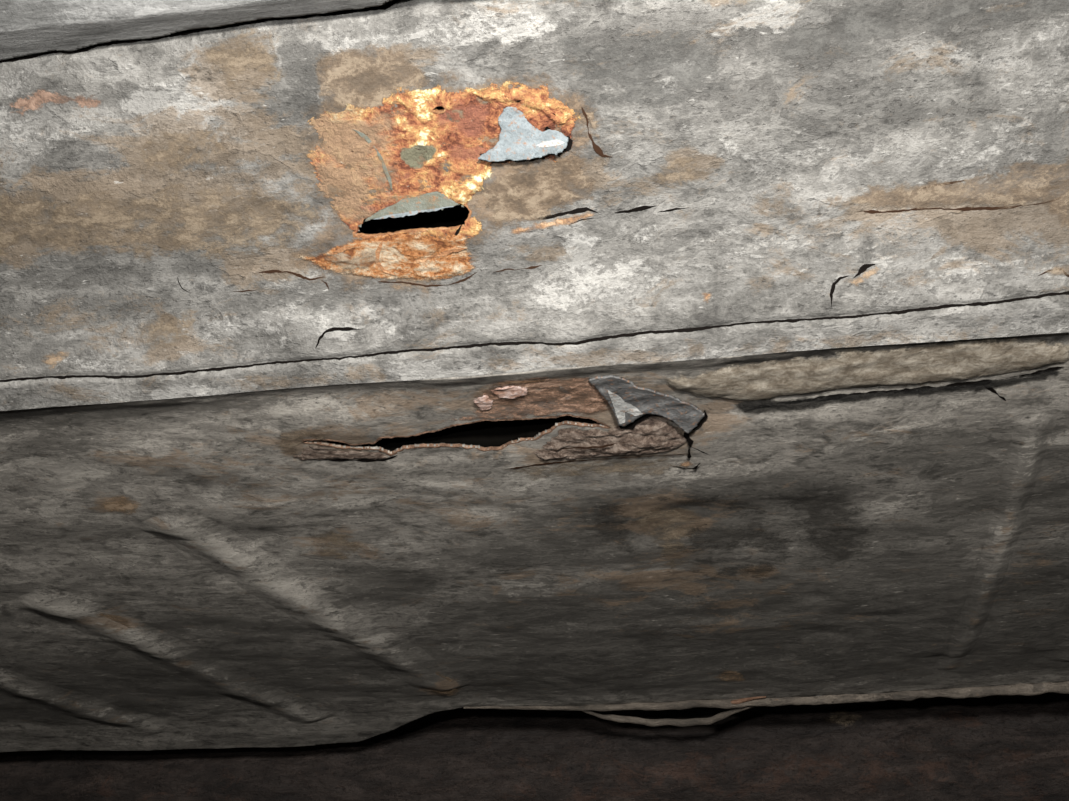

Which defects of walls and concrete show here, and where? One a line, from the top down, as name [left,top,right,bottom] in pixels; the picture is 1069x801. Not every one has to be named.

crack [0,0,400,63]
corrosion [206,31,280,85]
peeling [478,107,573,162]
corrosion [0,78,593,284]
spalling [299,191,477,287]
crack [533,206,689,225]
crack [0,264,1069,382]